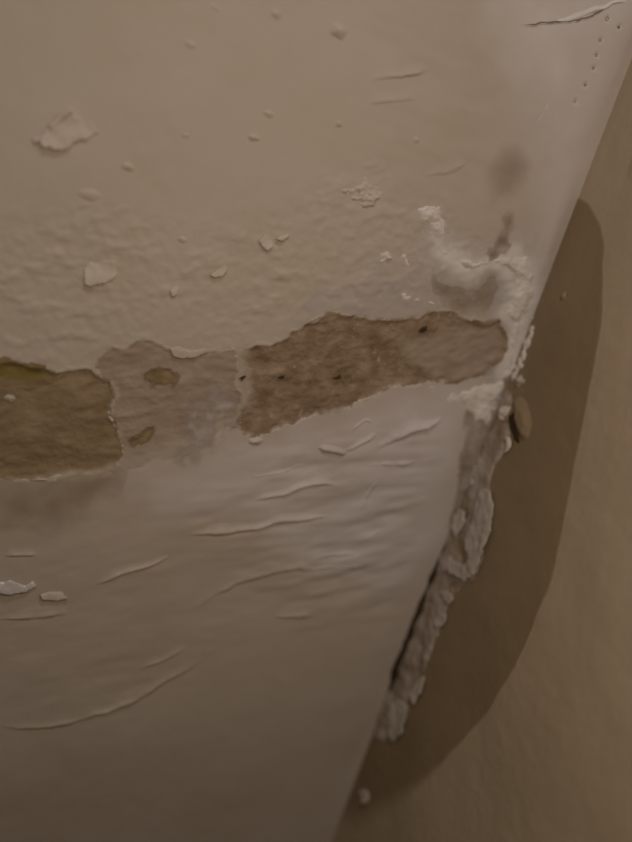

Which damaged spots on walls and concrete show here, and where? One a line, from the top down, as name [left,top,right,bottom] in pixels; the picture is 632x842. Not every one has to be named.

peeling [32,108,98,151]
flaking render [0,308,508,484]
peeling [0,580,68,601]
damp [0,197,606,833]
flaking render [373,375,513,742]